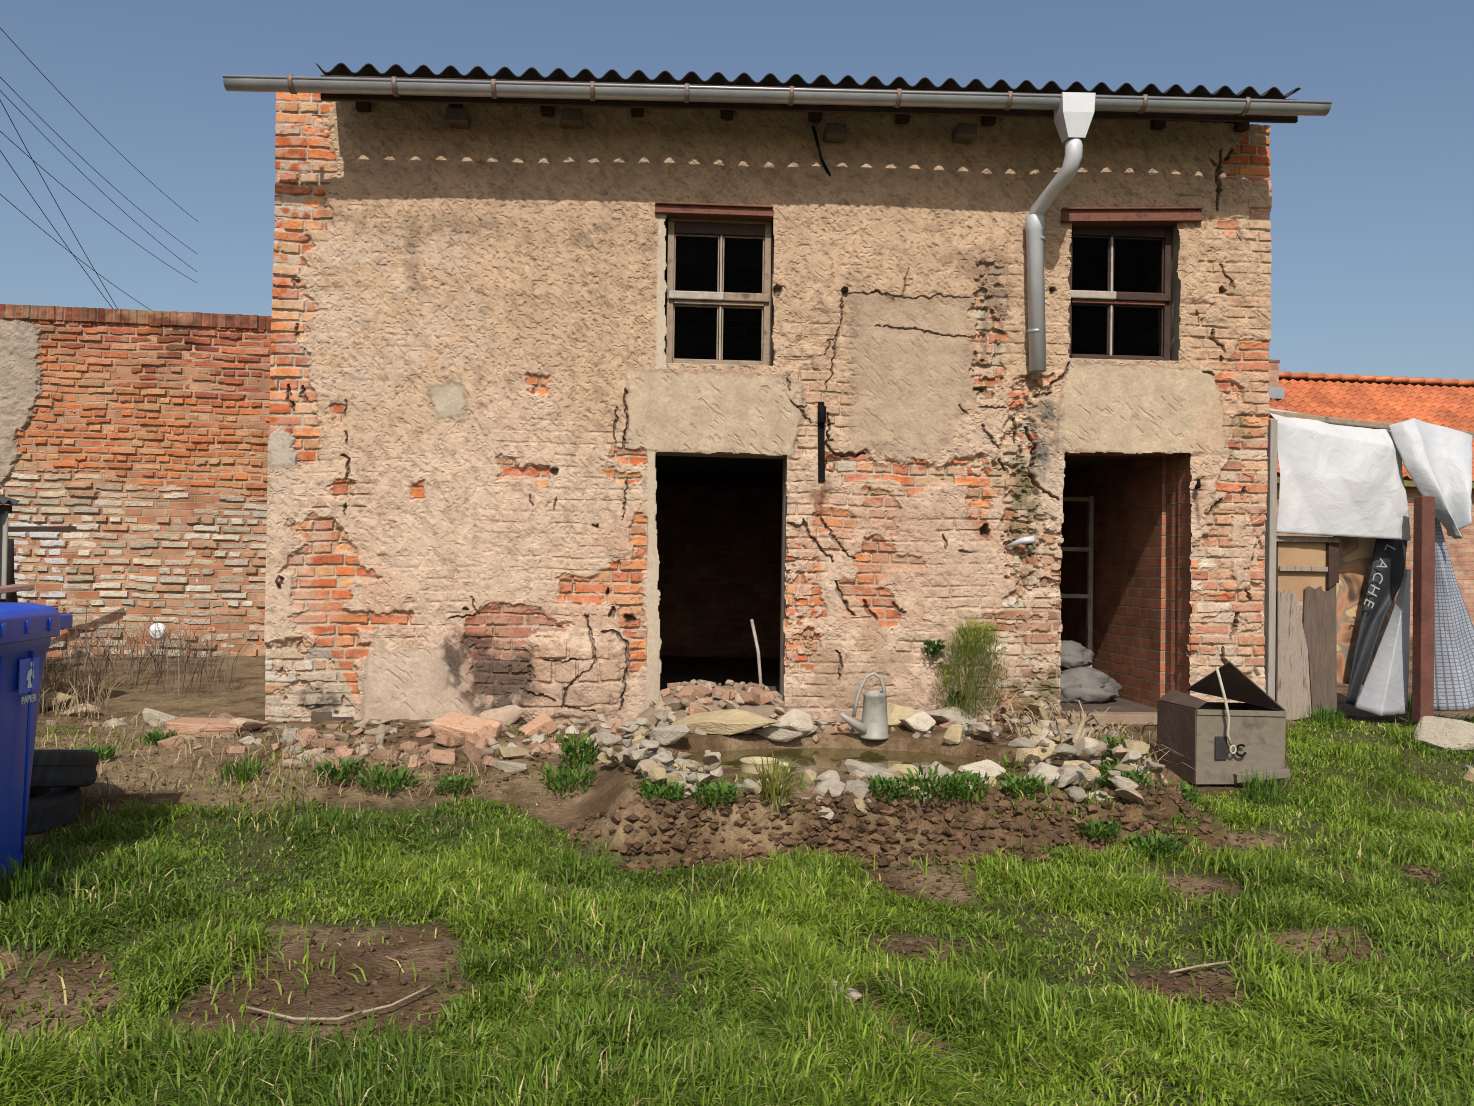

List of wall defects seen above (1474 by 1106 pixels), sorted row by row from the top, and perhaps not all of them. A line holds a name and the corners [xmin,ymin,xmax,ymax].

spalling [1,92,346,501]
spalling [265,479,414,722]
spalling [496,455,559,489]
spalling [462,512,652,702]
crack [530,614,630,713]
crack [786,273,970,469]
spalling [783,260,1064,725]
crack [958,362,1070,500]
spalling [1186,337,1270,682]
spalling [1216,209,1271,237]
spalling [1219,126,1271,182]